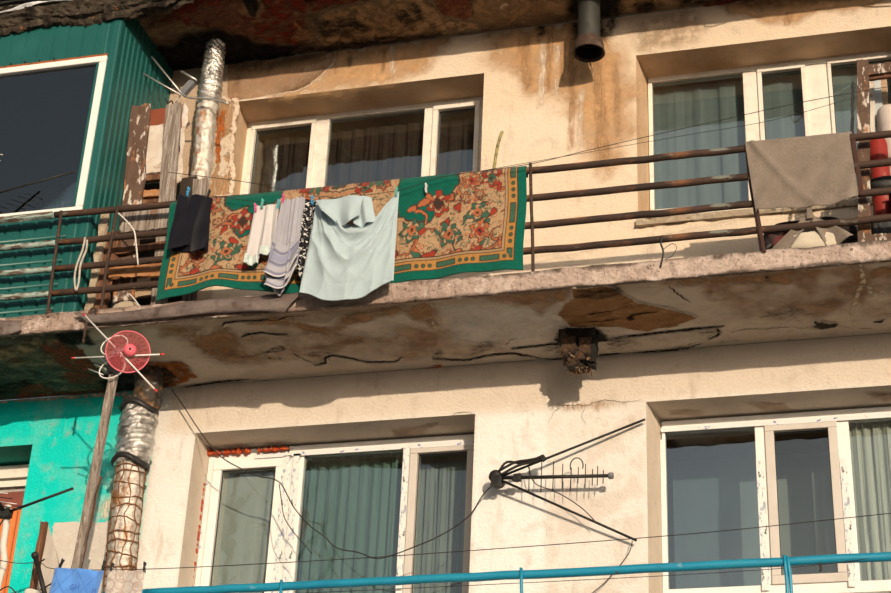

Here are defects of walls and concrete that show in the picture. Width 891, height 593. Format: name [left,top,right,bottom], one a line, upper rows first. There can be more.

spalling [313,0,483,53]
water stain [726,0,883,25]
water stain [488,22,638,160]
water stain [164,327,277,363]
crack [222,316,410,366]
water stain [250,303,446,359]
crack [432,338,562,362]
water stain [490,290,568,311]
spalling [555,286,699,333]
crack [611,306,808,354]
water stain [679,269,821,302]